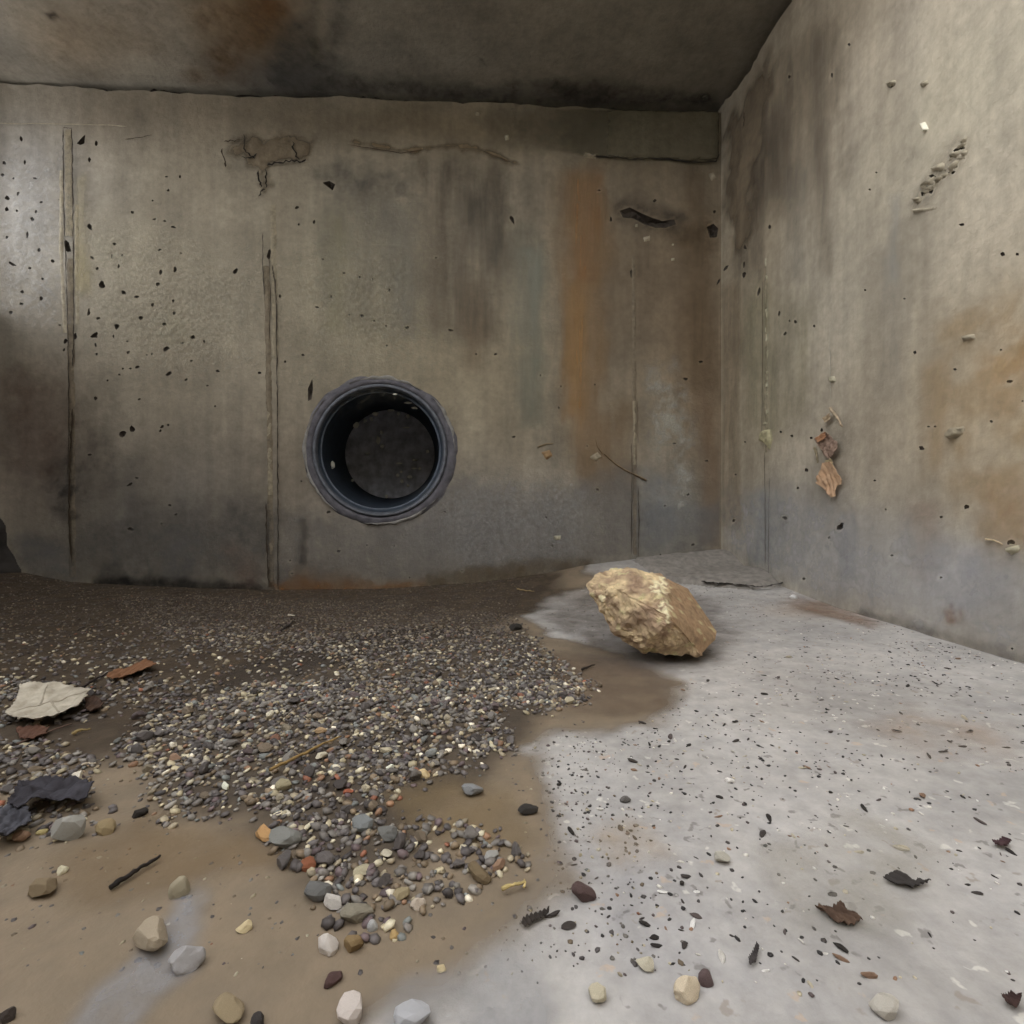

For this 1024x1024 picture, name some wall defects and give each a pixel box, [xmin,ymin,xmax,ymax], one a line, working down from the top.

spalling [911,137,969,213]
spalling [610,207,676,228]